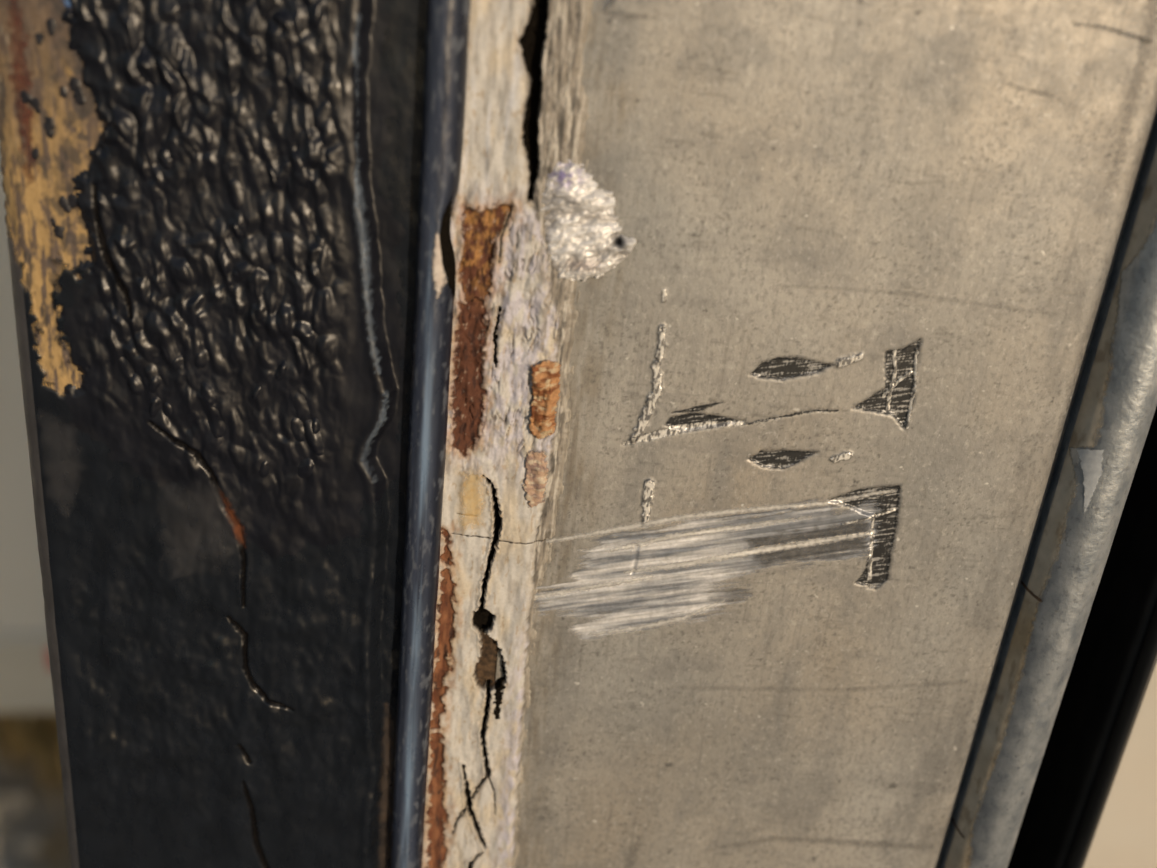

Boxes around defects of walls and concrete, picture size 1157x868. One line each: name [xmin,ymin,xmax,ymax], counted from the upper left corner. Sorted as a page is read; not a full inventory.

peeling [0,0,105,396]
crack [499,0,548,263]
crack [149,421,294,710]
corrosion [451,204,513,457]
crack [493,307,502,367]
crack [452,477,545,608]
corrosion [523,360,561,508]
peeling [944,149,1157,868]
crack [238,744,269,868]
corrosion [425,528,456,868]
crack [452,679,496,868]